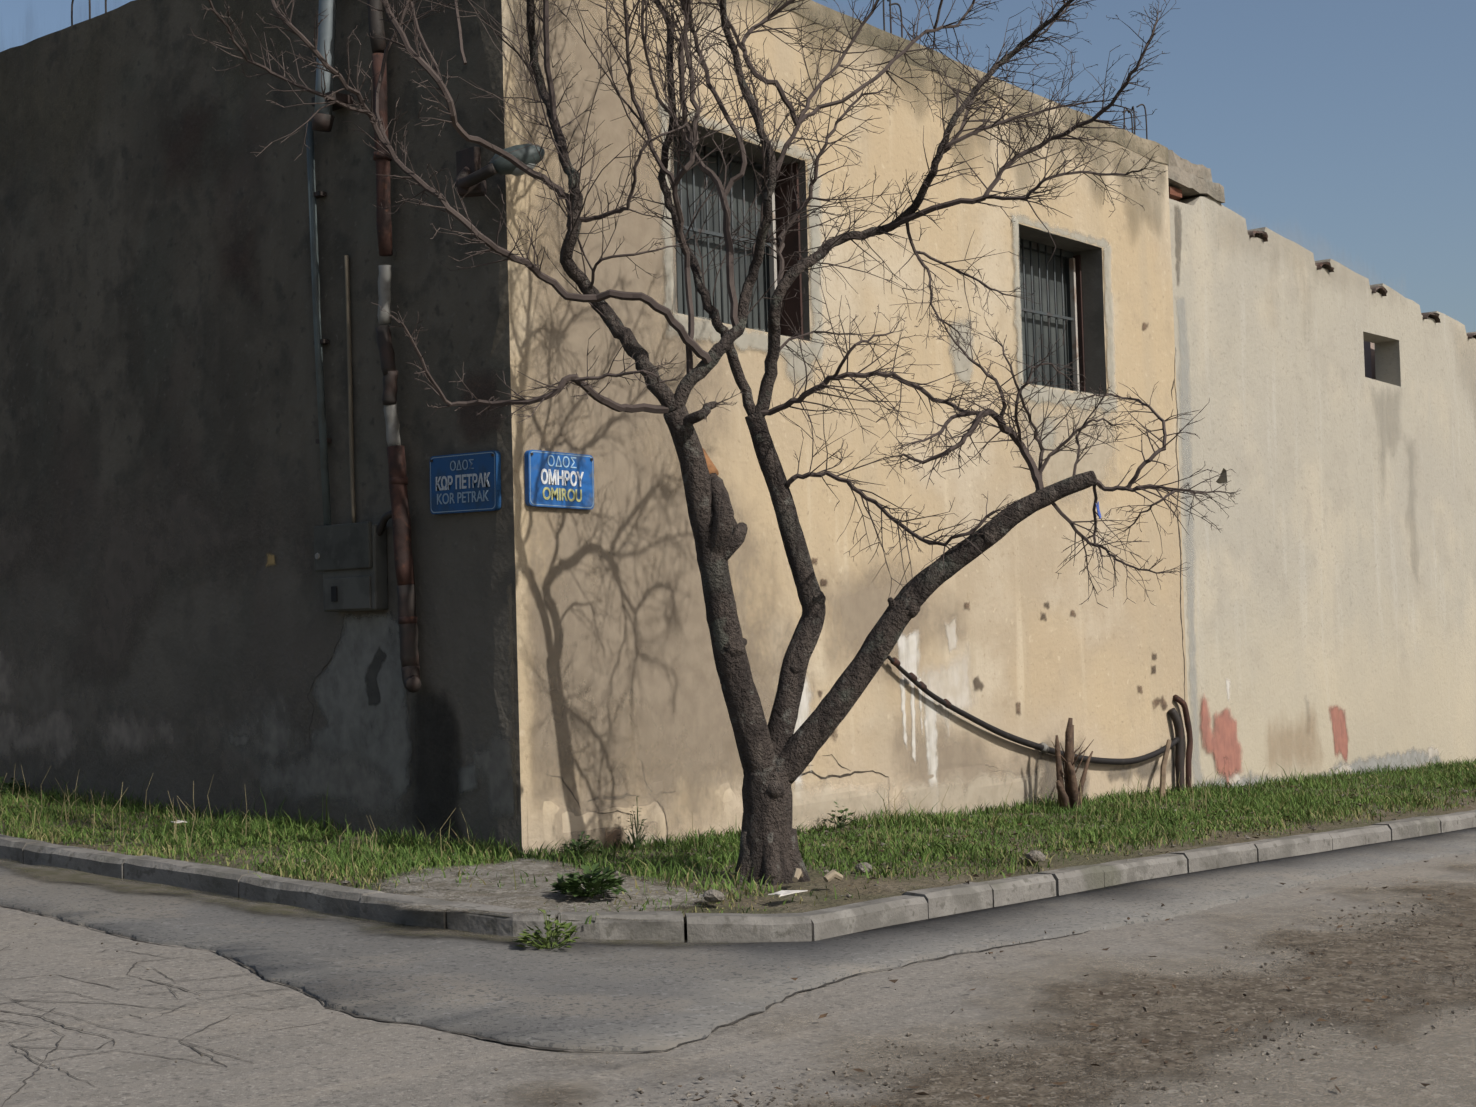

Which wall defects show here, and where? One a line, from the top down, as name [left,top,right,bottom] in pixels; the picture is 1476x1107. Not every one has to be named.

water stain [517,0,735,782]
water stain [834,572,908,653]
water stain [889,606,923,657]
flaking render [0,644,77,763]
flaking render [97,711,181,757]
water stain [746,649,775,725]
water stain [900,679,949,788]